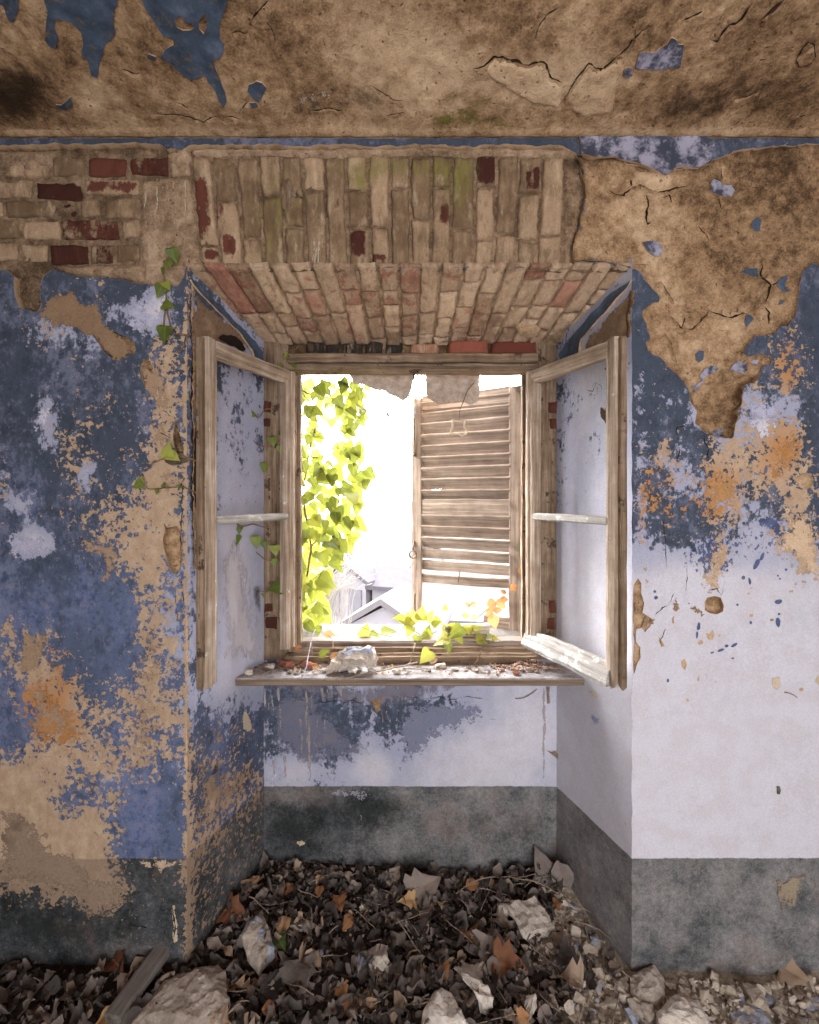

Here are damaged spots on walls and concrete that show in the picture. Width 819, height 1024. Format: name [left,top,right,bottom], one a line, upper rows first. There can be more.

peeling [44,0,118,78]
peeling [142,0,227,107]
crack [473,7,650,101]
crack [683,0,791,51]
crack [609,180,689,225]
flaking render [0,136,819,458]
crack [626,264,779,363]
flaking render [672,542,727,623]
leakage [264,688,286,778]
leakage [294,686,454,780]
leakage [332,789,398,829]
peeling [0,808,130,919]